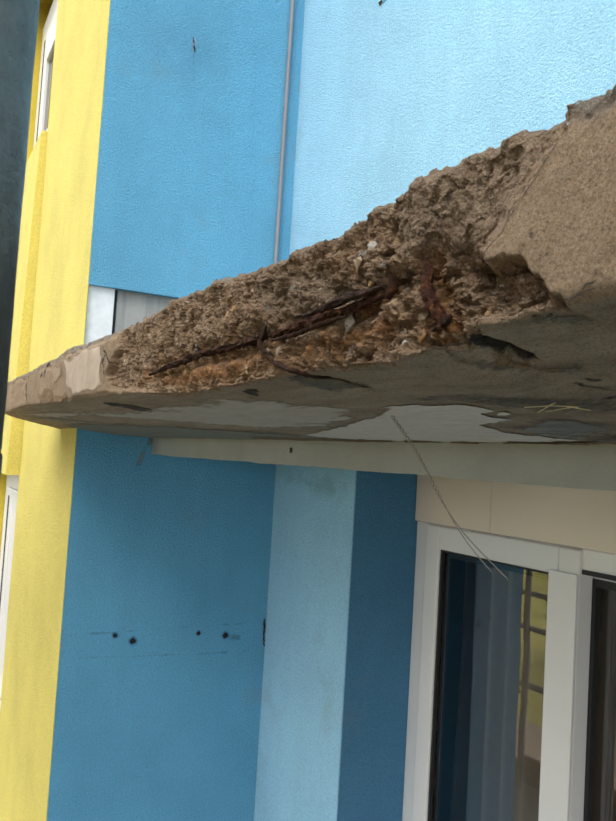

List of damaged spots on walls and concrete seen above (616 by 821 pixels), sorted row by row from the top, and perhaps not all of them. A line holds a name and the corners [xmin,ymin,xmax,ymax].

rust [167,353,262,385]
spalling [27,100,605,445]